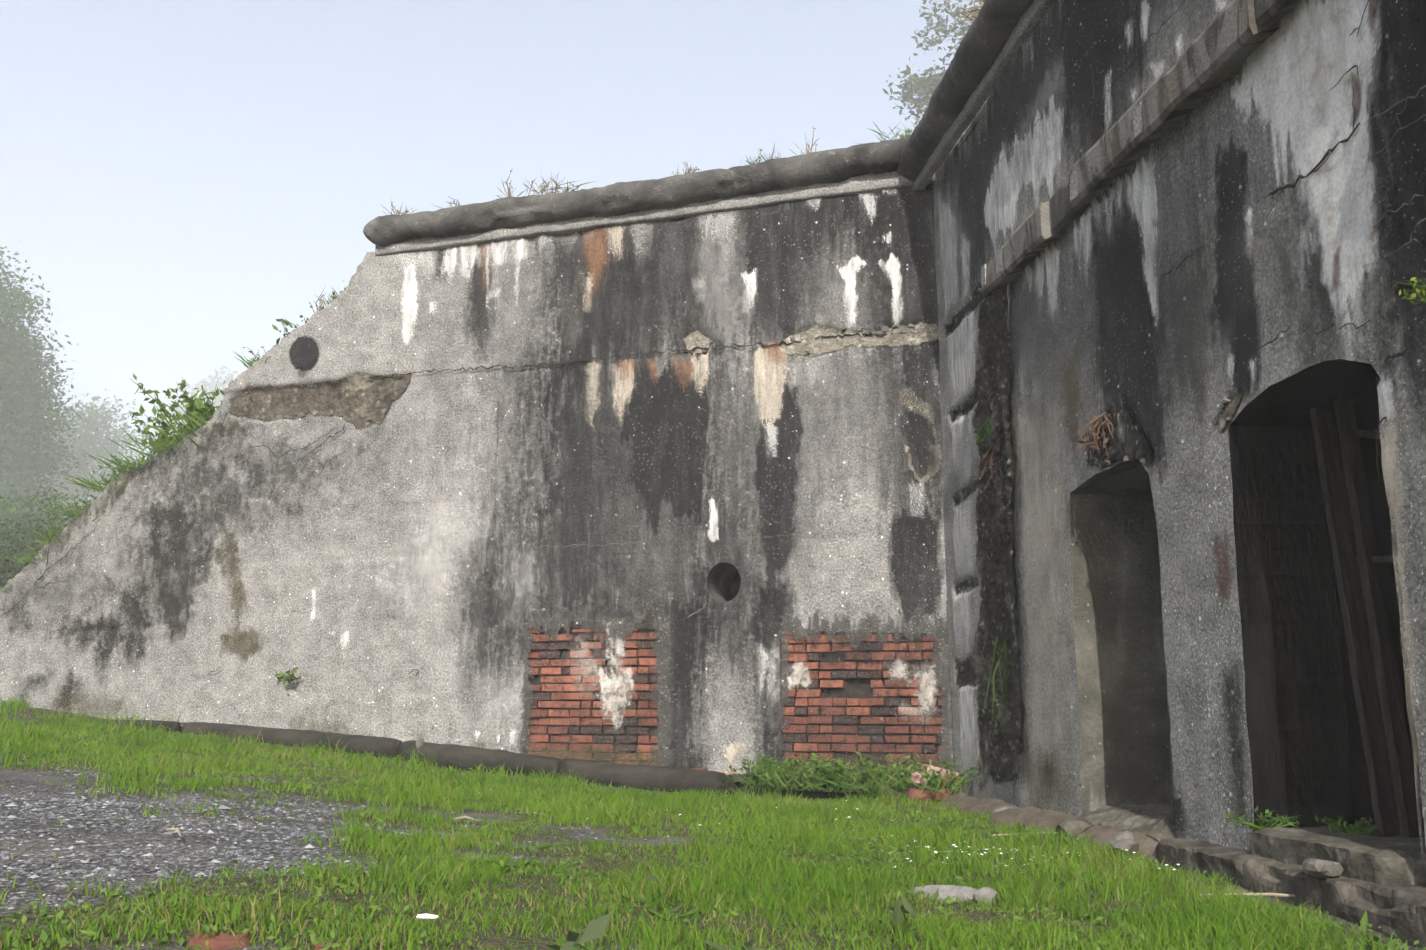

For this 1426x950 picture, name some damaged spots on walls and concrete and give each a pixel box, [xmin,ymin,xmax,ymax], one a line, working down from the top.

crack [1264,0,1426,199]
rust [584,226,622,285]
crack [1370,194,1426,252]
leakage [60,501,211,669]
spalling [229,372,411,429]
leakage [460,544,508,669]
peeling [519,588,676,767]
spalling [775,285,1024,783]
leakage [1007,137,1264,790]